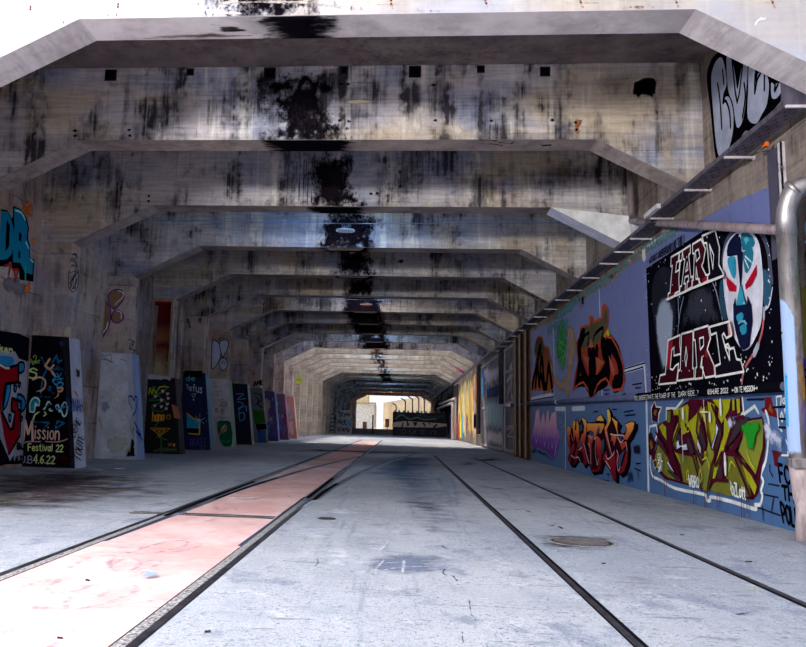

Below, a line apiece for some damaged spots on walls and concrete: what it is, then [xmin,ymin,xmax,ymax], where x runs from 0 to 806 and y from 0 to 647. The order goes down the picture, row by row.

leakage [0,471,140,509]